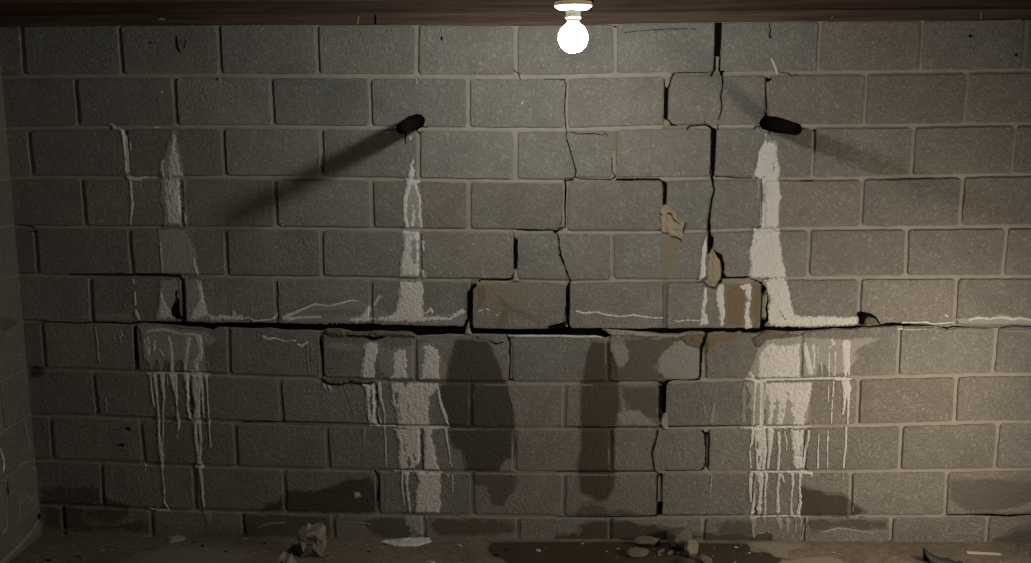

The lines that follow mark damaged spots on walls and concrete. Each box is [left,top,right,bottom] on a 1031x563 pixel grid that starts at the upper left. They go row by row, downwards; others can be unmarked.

spalling [660,205,684,239]
crack [46,22,964,517]
spalling [704,249,721,287]
water stain [75,123,888,563]
spalling [751,331,803,348]
crack [946,511,1031,519]